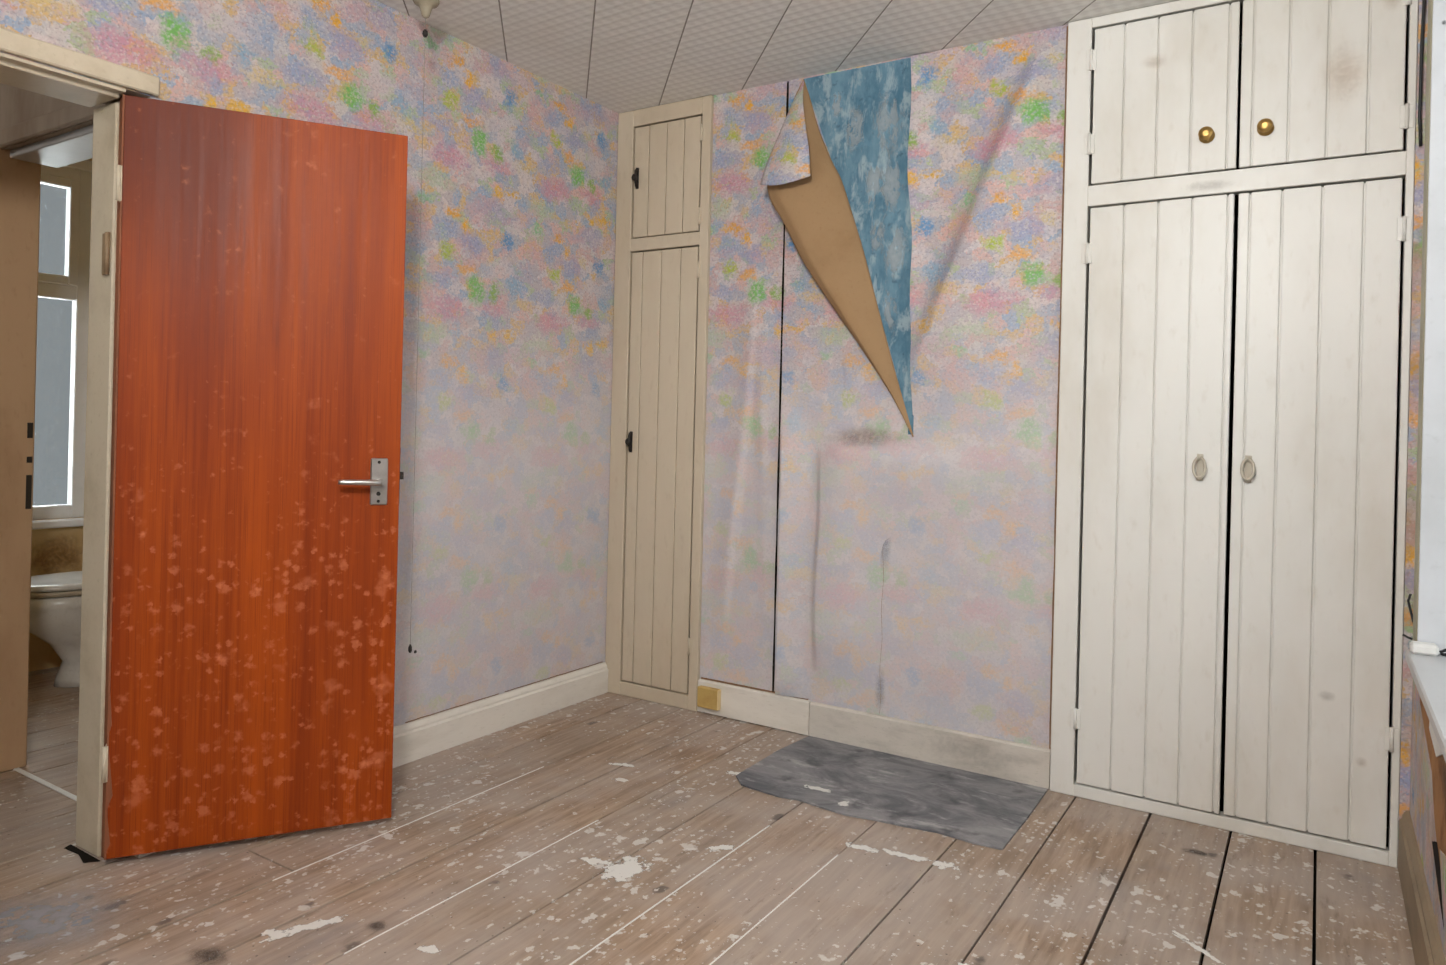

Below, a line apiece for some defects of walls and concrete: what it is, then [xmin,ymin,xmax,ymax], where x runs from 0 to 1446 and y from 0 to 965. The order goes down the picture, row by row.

flaking render [803,58,914,434]
flaking render [1420,698,1446,861]